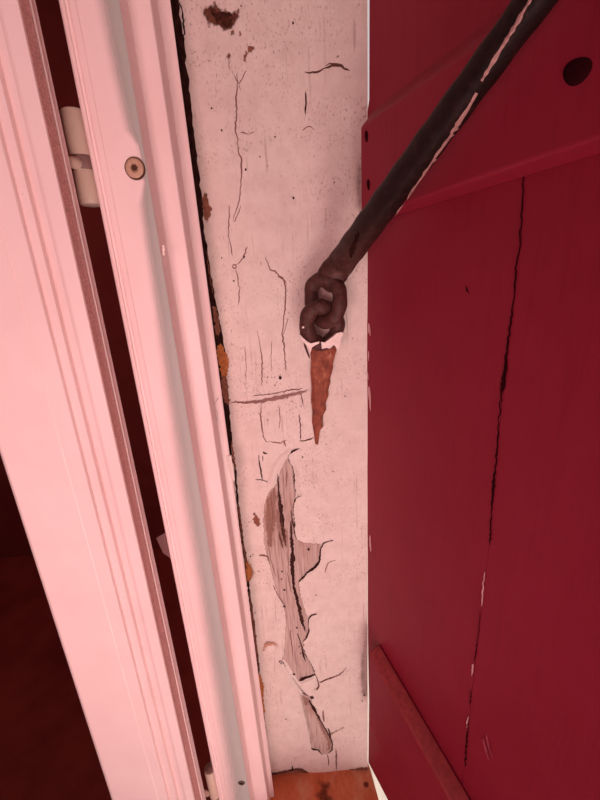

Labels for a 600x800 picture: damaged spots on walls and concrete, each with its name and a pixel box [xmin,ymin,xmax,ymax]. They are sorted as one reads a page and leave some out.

crack [302,55,350,131]
crack [228,70,253,304]
rust [216,344,230,405]
crack [245,258,288,386]
crack [256,395,314,482]
crack [489,177,524,544]
peeling [253,449,335,766]
crack [462,723,470,766]